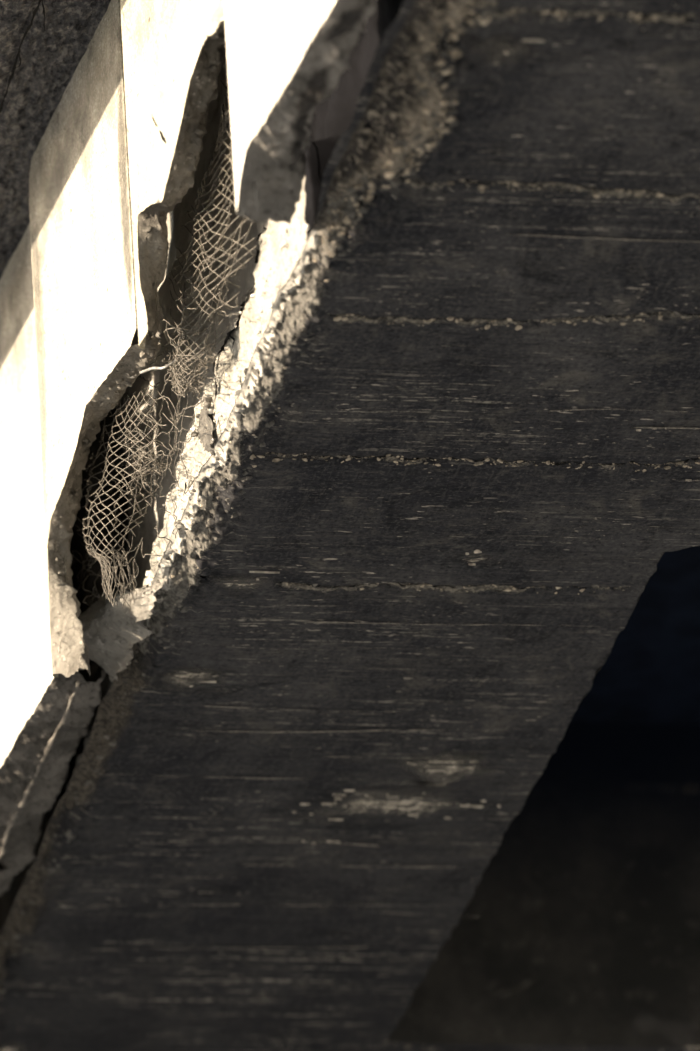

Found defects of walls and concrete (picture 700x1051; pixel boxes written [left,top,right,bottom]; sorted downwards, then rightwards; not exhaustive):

crack [0,681,80,857]
spalling [0,0,545,1000]